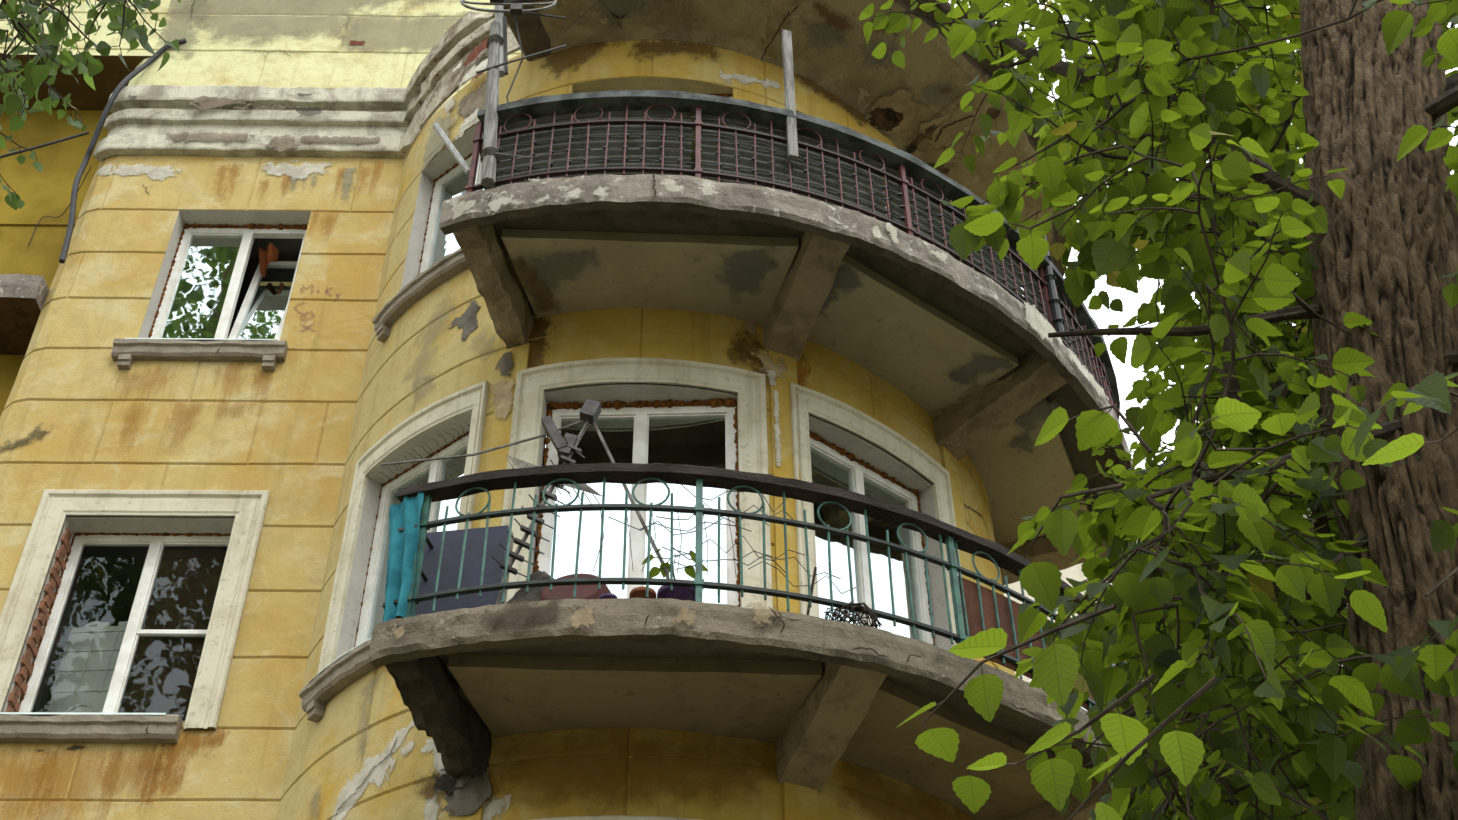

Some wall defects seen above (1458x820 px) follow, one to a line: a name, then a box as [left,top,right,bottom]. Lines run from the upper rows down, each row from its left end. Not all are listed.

leakage [163,0,459,56]
leakage [541,42,607,77]
leakage [629,39,718,61]
leakage [794,74,871,125]
spalling [864,88,1005,174]
peeling [448,300,481,341]
leakage [2,429,47,450]
peeling [400,740,414,756]